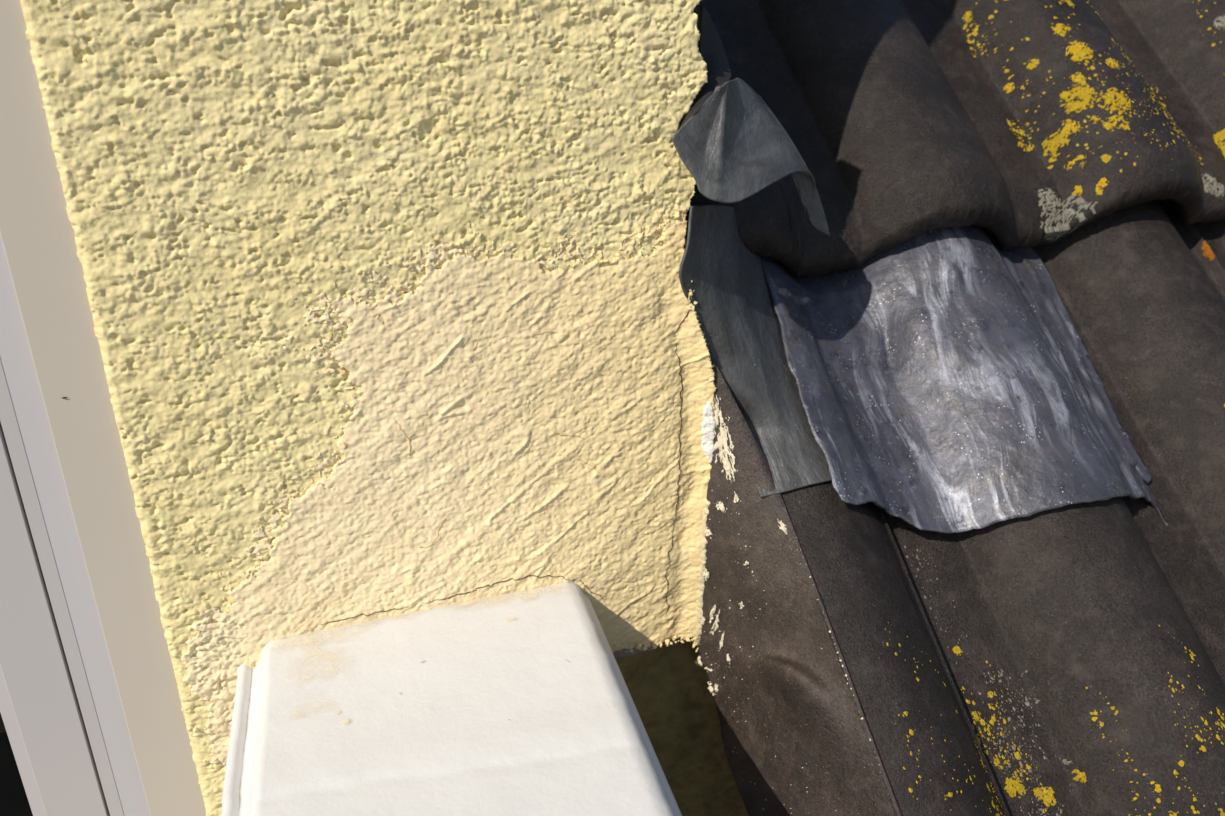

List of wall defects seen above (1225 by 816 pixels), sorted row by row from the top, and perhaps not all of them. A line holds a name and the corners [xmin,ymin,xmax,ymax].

crack [665,307,691,614]
crack [320,575,601,625]
spalling [613,501,711,659]